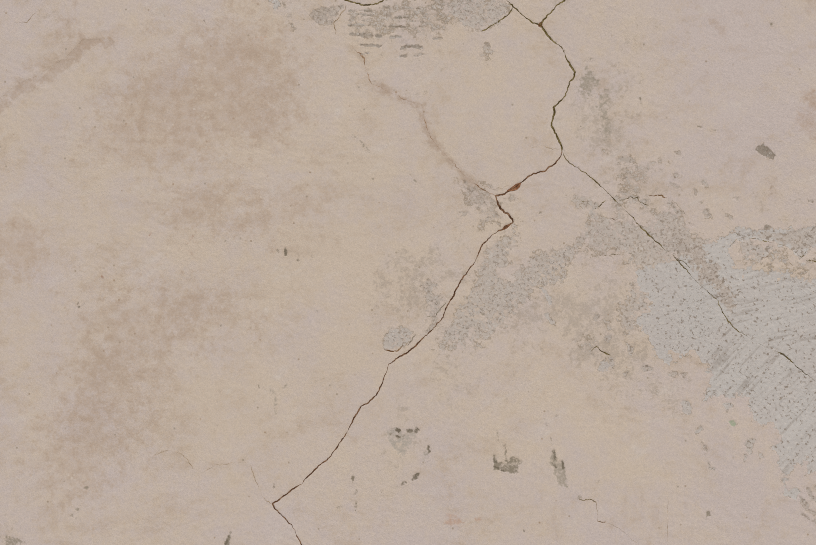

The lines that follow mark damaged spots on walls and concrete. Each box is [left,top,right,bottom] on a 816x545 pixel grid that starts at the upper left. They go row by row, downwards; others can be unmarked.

flaking render [308,1,360,29]
flaking render [453,0,515,67]
crack [155,0,747,545]
flaking render [418,141,816,525]